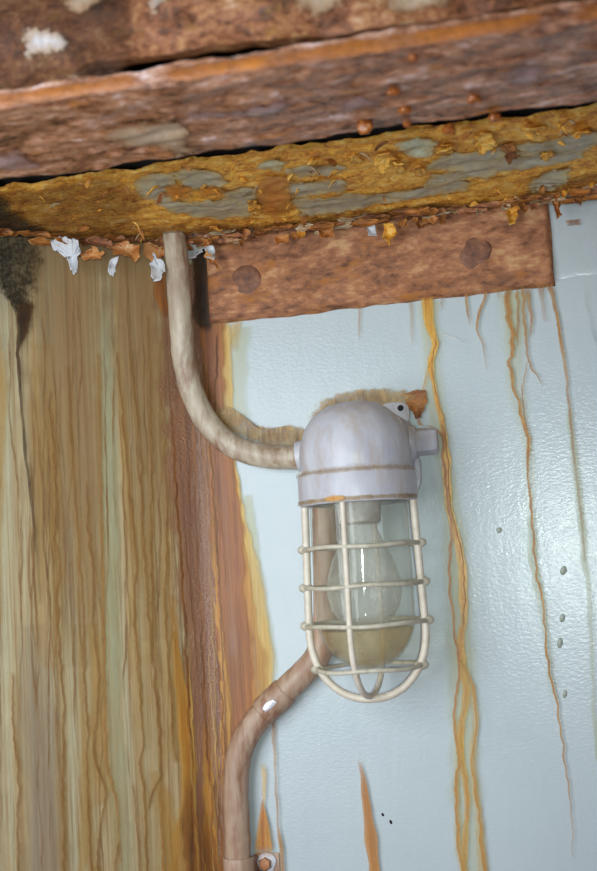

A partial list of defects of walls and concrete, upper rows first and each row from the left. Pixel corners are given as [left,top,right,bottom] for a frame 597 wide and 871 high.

rust [167,13,541,81]
peeling [133,169,258,220]
peeling [107,99,288,158]
peeling [258,132,597,217]
peeling [51,236,81,275]
peeling [149,253,165,282]
water stain [116,241,164,424]
water stain [0,198,120,730]
rust [78,220,273,871]
rust [403,298,486,871]
rust [504,285,573,802]
rust [360,769,379,871]